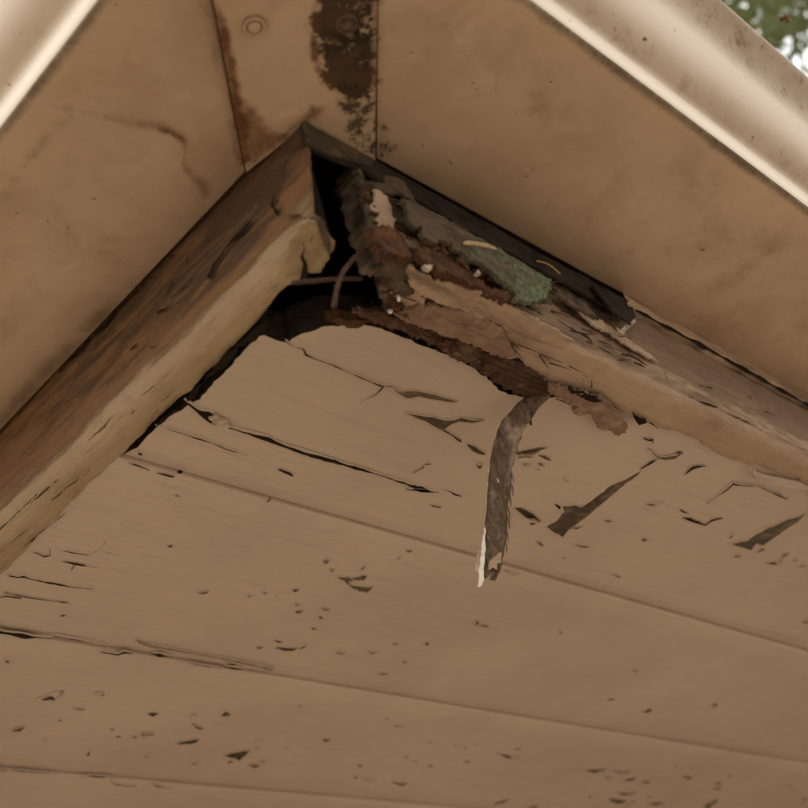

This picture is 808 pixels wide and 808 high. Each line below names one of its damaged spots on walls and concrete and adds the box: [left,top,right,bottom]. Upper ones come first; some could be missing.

damp [308,0,397,157]
peeling [279,146,331,278]
peeling [364,175,427,249]
peeling [385,263,573,349]
crack [512,296,616,357]
peeling [579,312,659,363]
crack [635,309,808,407]
peeling [404,412,485,469]
crack [632,412,657,470]
crack [689,385,762,431]
peeling [514,468,642,538]
peeling [727,513,805,558]